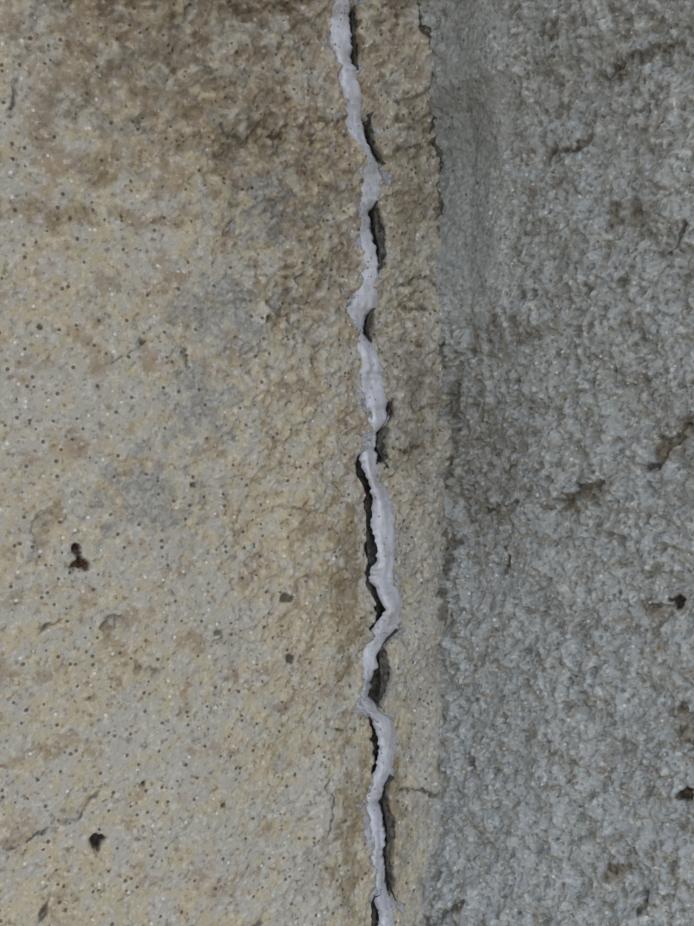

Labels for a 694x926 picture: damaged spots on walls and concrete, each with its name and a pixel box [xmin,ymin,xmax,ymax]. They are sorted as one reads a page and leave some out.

crack [349,5,359,70]
crack [417,0,432,44]
crack [346,72,444,233]
crack [362,184,387,276]
crack [400,276,435,312]
crack [356,308,376,351]
crack [355,398,437,926]